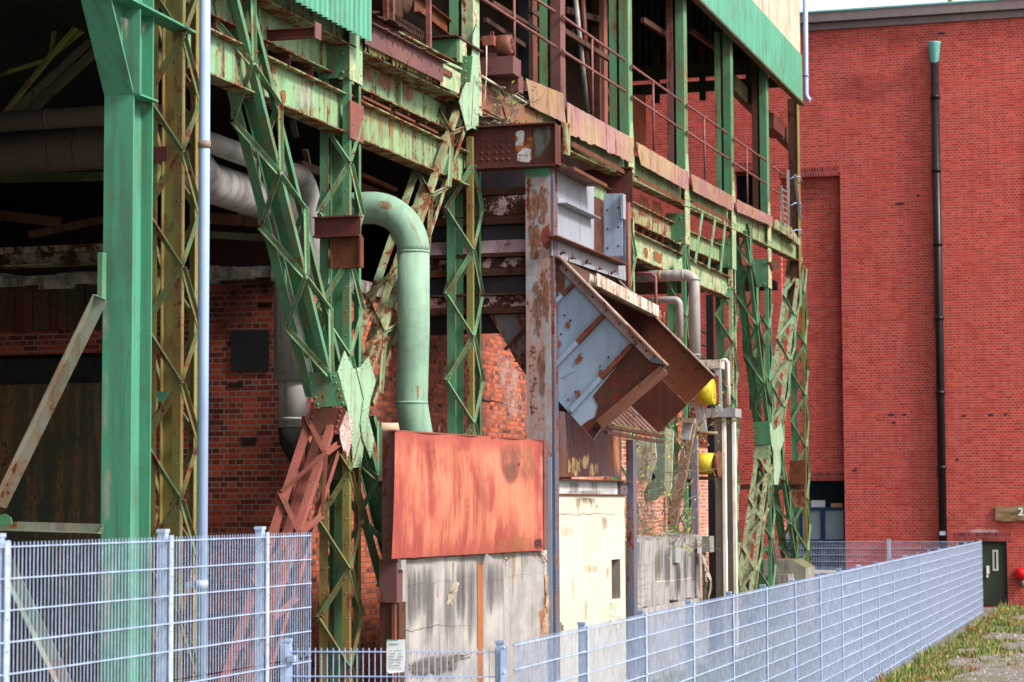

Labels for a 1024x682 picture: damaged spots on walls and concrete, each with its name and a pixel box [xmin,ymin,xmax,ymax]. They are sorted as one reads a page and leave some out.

rust [365,65,413,100]
peeling [514,130,533,162]
rust [626,310,645,340]
rust [608,436,620,470]
leakage [408,572,438,625]
leakage [447,574,472,626]
leakage [488,570,497,605]